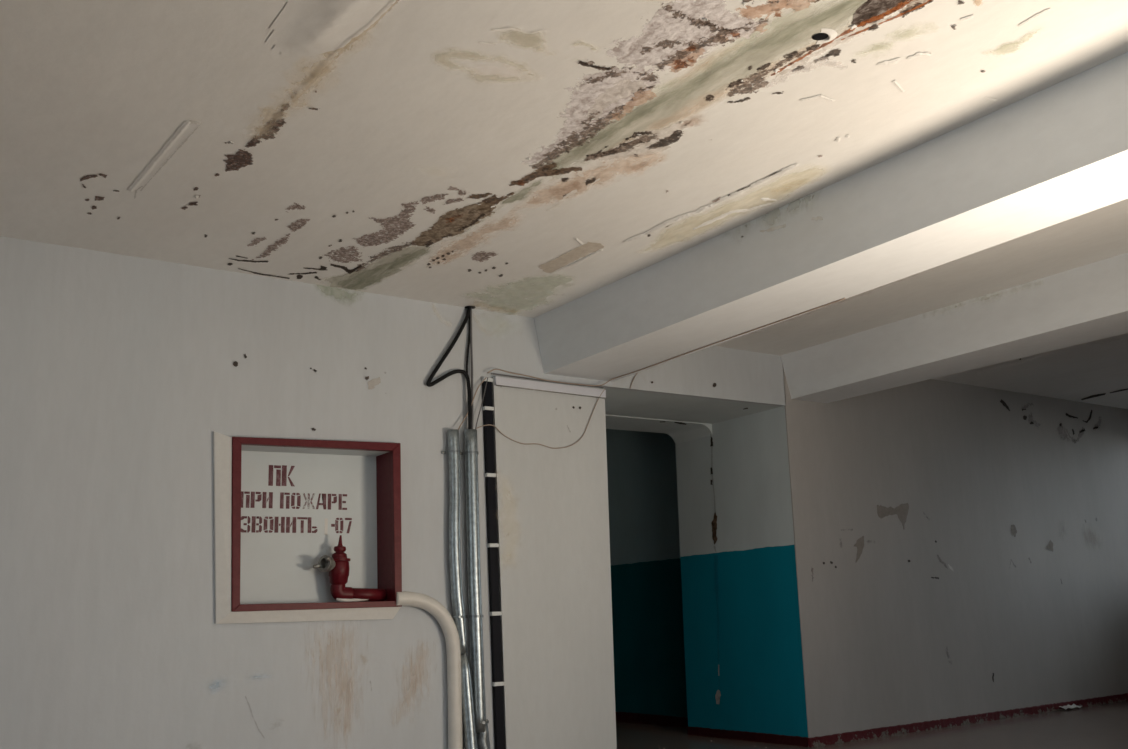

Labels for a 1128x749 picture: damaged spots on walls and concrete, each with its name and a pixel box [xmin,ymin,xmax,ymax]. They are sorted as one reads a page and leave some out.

crack [257,0,399,132]
leakage [552,0,868,176]
flaking render [726,44,856,103]
corrosion [771,0,932,78]
spalling [850,0,932,31]
flaking render [215,0,782,281]
peeling [80,173,119,215]
leakage [329,246,429,289]